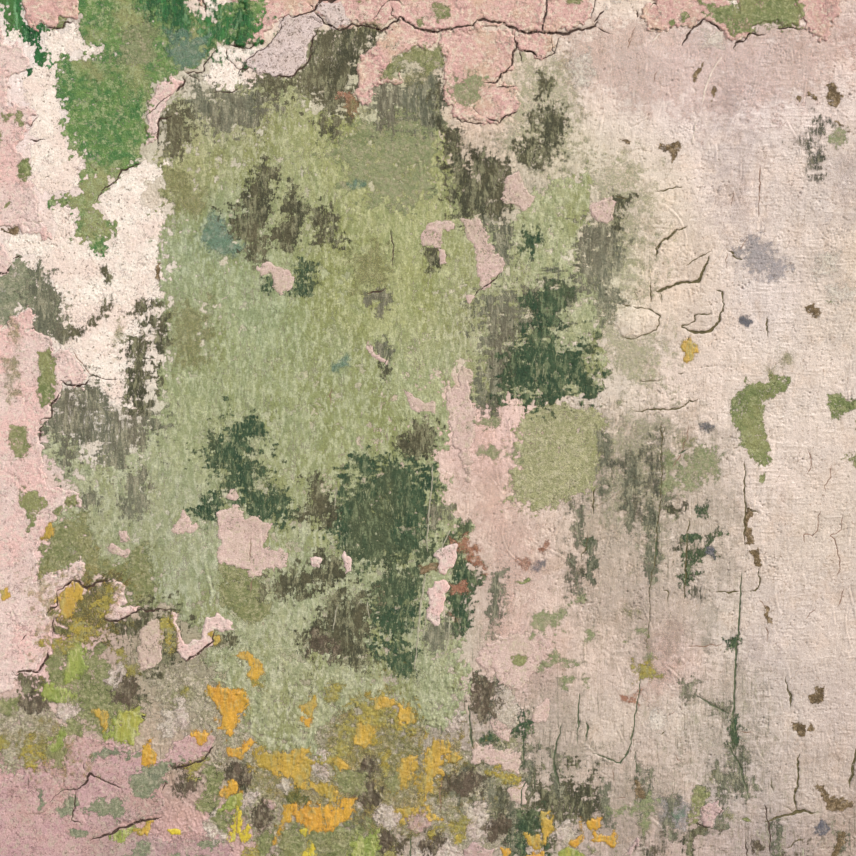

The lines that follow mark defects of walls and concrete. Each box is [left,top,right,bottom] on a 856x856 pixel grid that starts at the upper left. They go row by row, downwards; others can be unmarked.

crack [146,0,608,143]
crack [682,19,800,49]
crack [622,238,748,340]
flaking render [0,0,621,856]
leakage [183,396,549,685]
leakage [561,414,729,602]
leakage [743,507,762,567]
crack [17,580,109,676]
leakage [722,632,743,652]
crack [30,765,162,840]
leakage [630,672,762,856]
leakage [749,782,853,856]